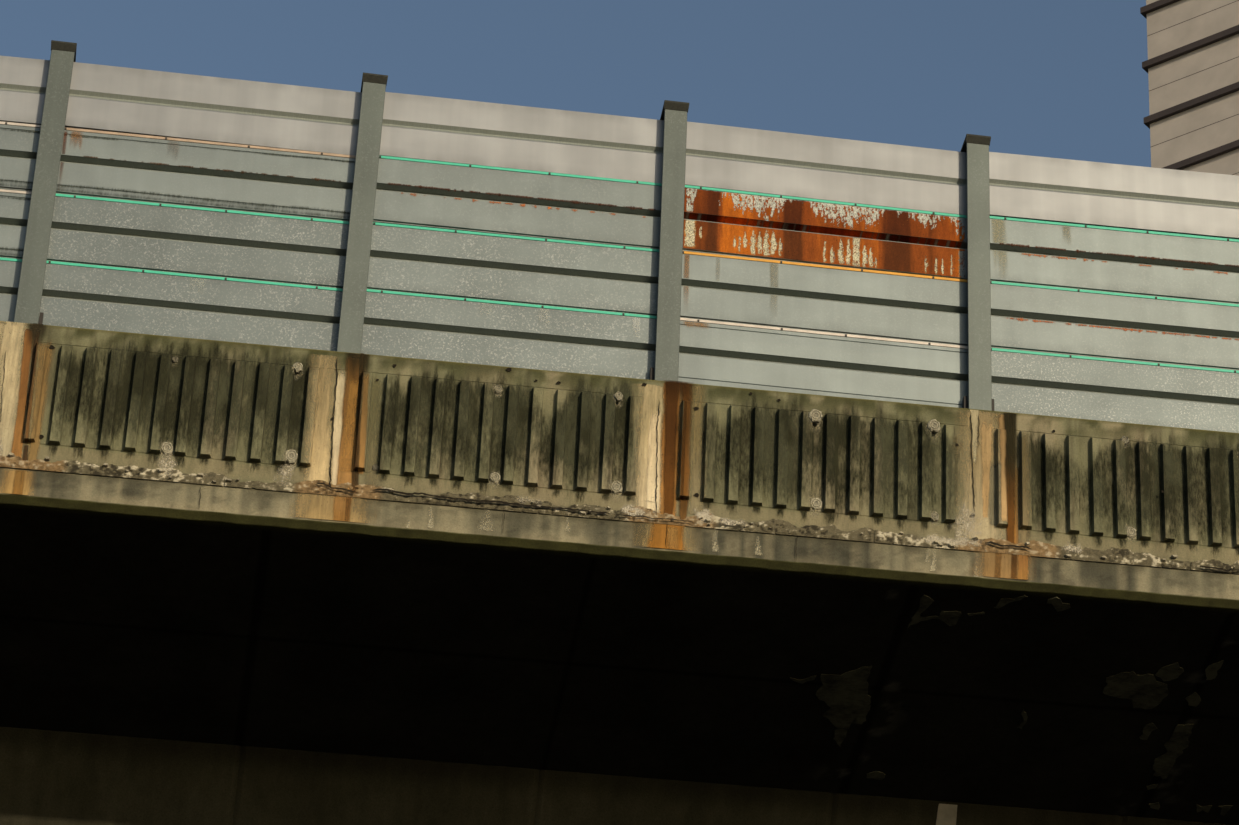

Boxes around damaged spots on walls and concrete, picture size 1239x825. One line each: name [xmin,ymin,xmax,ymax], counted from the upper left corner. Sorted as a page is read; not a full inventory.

corrosion [683,188,965,277]
corrosion [0,321,52,495]
leakage [50,343,313,481]
corrosion [298,353,380,523]
leakage [378,373,654,516]
corrosion [639,380,703,550]
leakage [695,396,980,577]
corrosion [964,410,1030,580]
leakage [1028,434,1239,554]